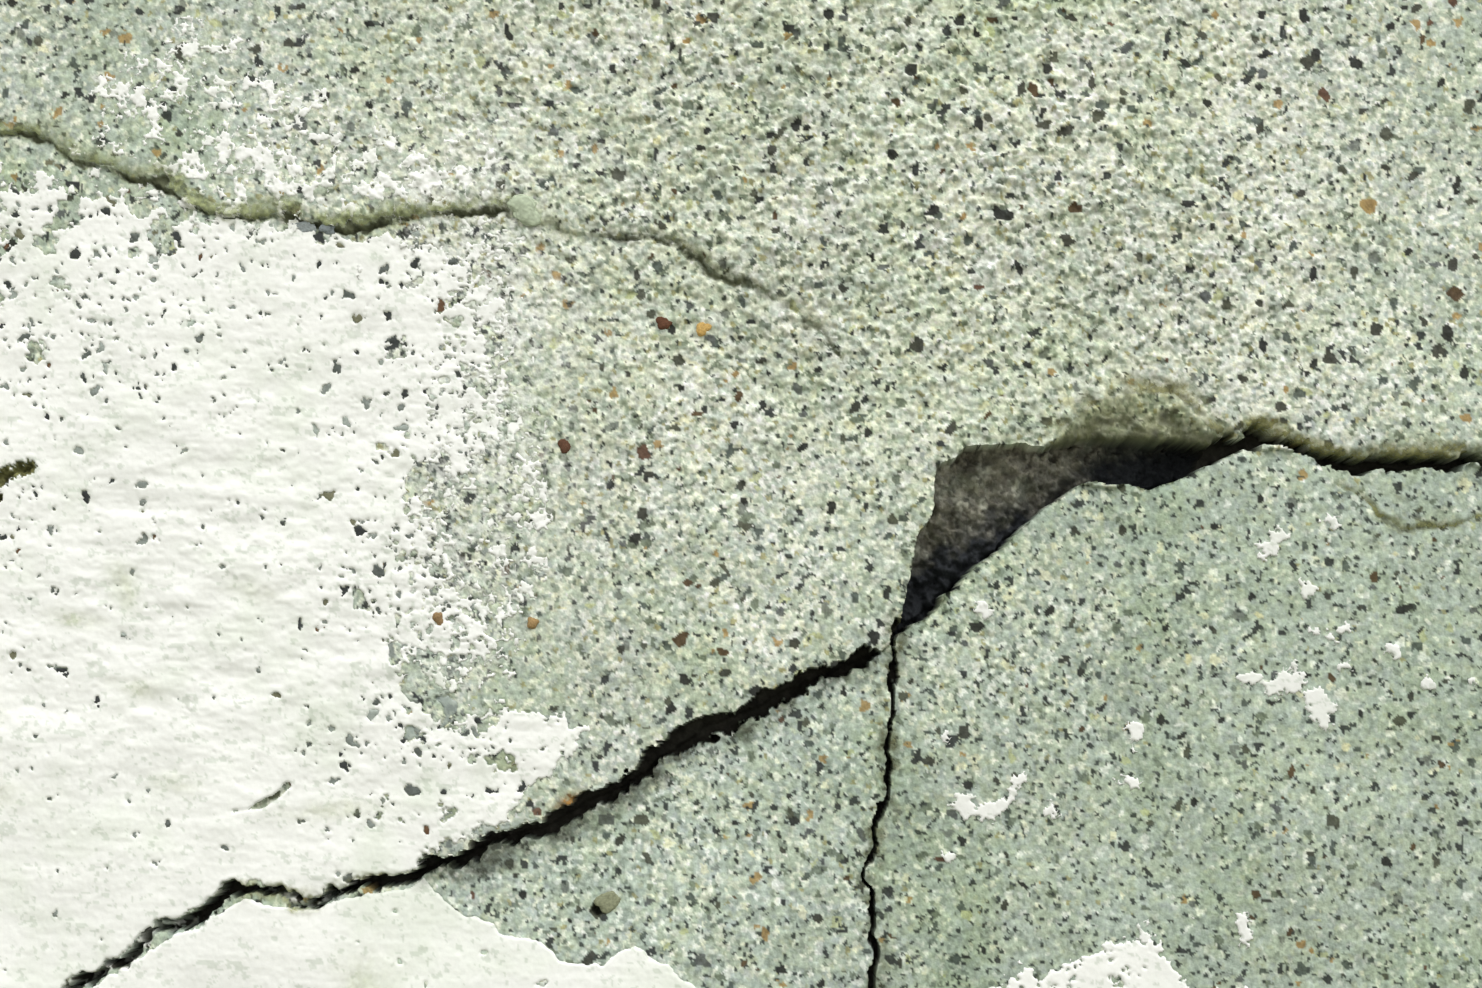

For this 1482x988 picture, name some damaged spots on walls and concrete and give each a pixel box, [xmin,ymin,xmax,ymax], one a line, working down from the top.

crack [0,130,512,236]
crack [598,231,856,389]
crack [1190,427,1482,476]
peeling [0,144,696,988]
crack [1375,515,1482,534]
crack [64,617,901,988]
peeling [990,919,1189,988]